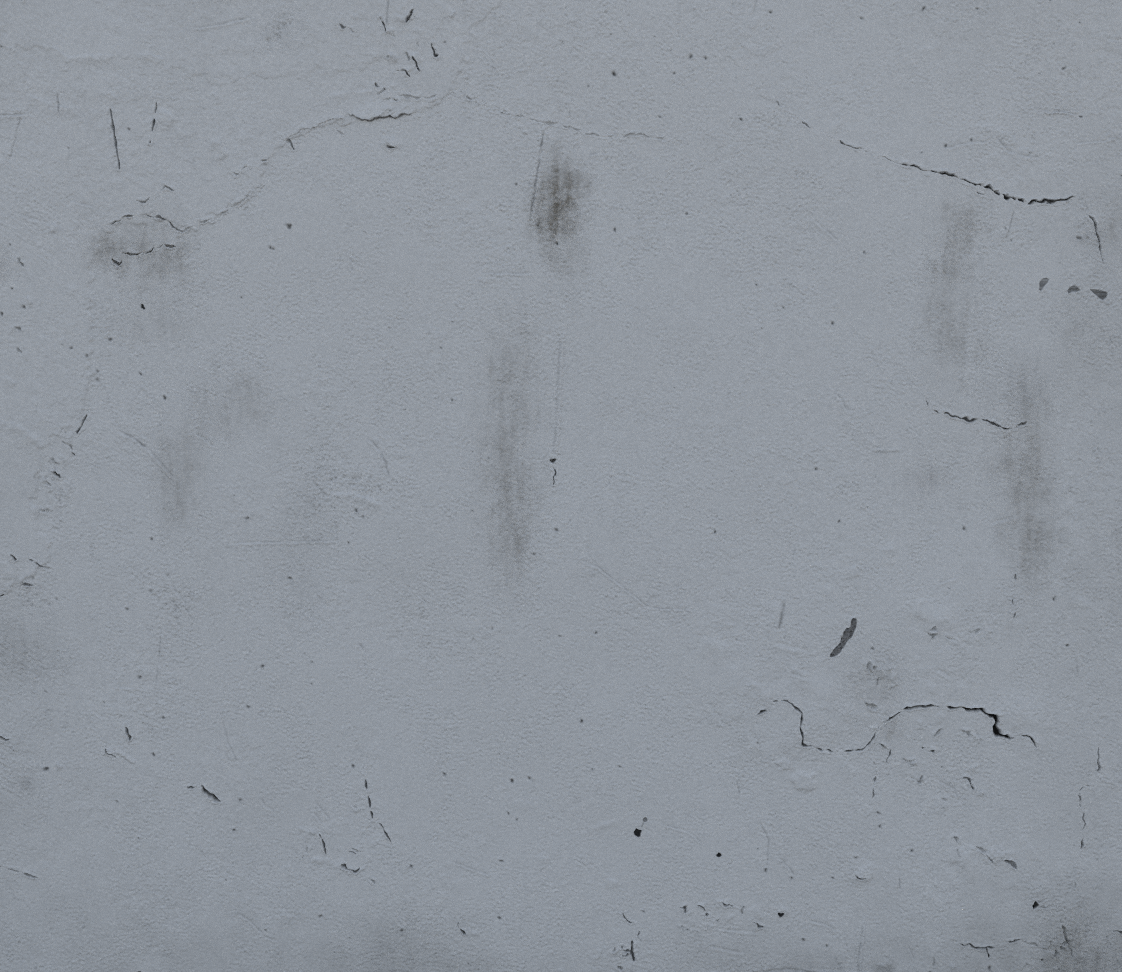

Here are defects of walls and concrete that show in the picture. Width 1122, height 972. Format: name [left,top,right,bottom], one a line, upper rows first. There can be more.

crack [754,84,1107,267]
crack [919,397,1036,435]
crack [755,697,1040,805]